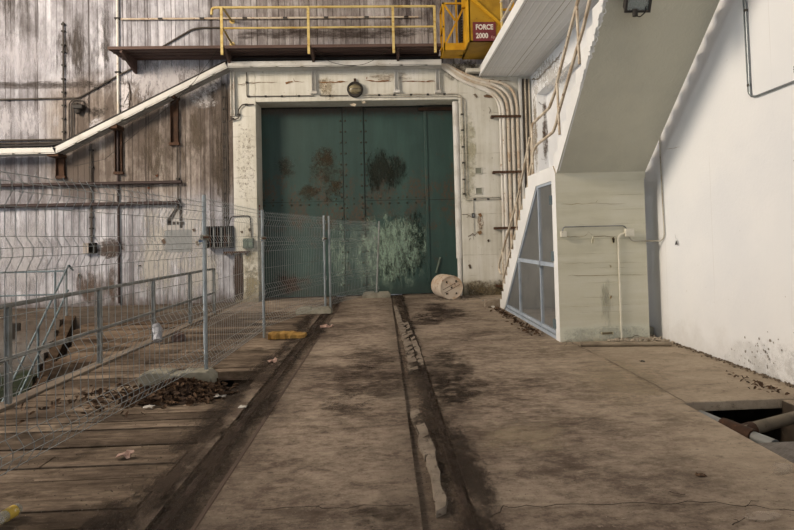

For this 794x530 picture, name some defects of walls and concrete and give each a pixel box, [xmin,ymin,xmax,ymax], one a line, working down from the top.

damp [64,25,93,72]
crack [490,504,564,518]
crack [587,491,794,525]